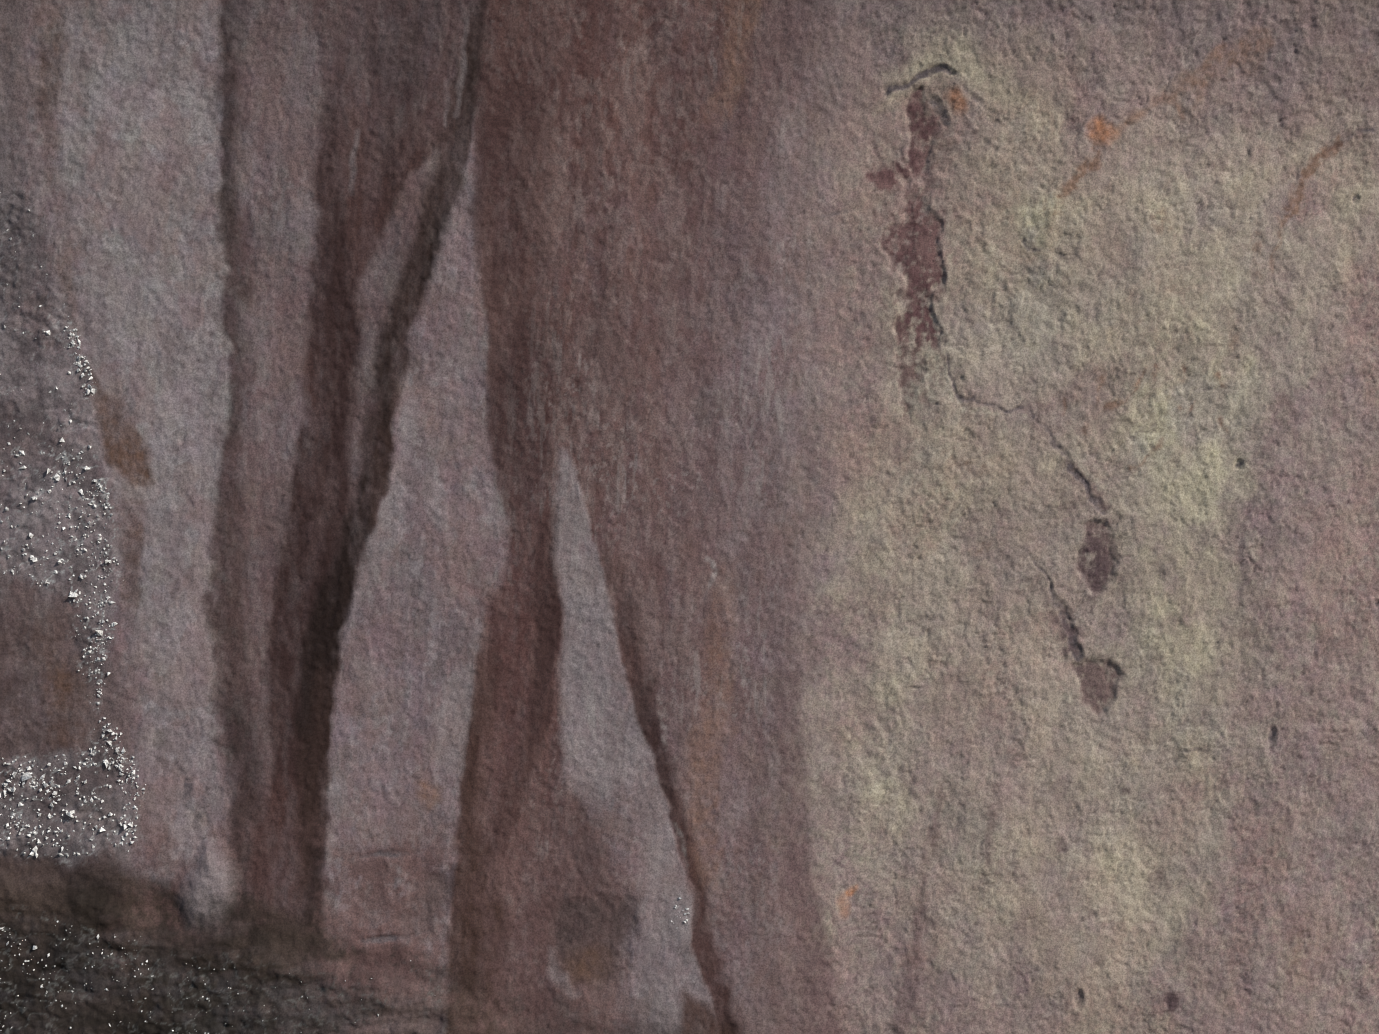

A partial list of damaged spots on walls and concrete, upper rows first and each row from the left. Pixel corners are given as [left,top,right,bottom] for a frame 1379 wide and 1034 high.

damp [0,0,851,1034]
crack [941,334,1120,514]
crack [1013,232,1081,265]
damp [807,3,1379,1034]